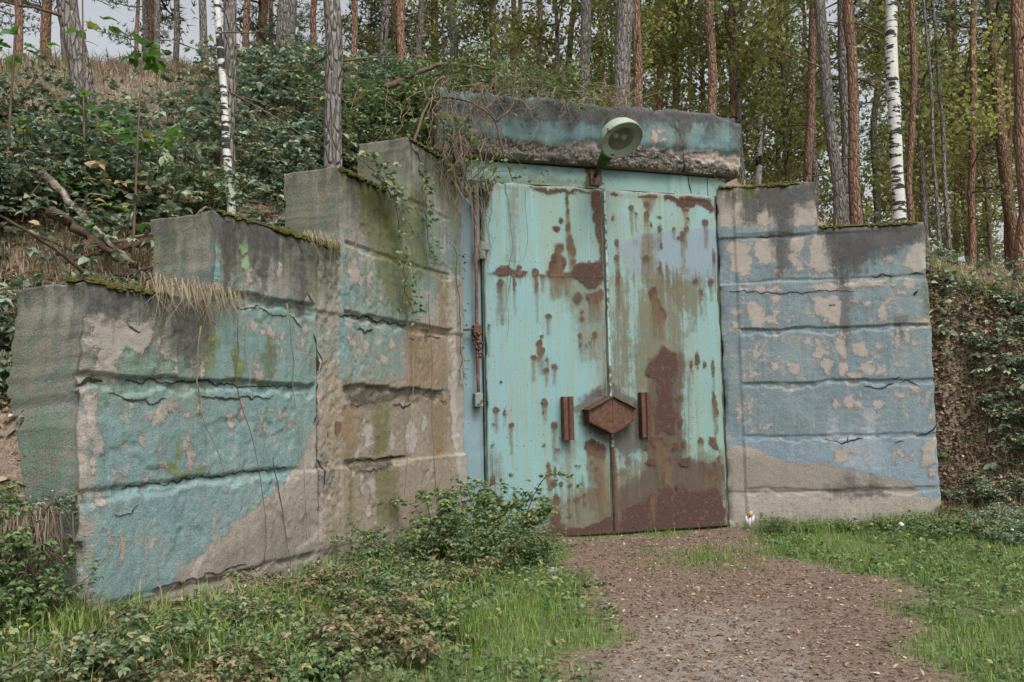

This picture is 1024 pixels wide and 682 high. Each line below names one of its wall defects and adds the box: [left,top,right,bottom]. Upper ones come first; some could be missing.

spalling [444,111,738,176]
peeling [79,289,212,514]
crack [70,289,405,517]
peeling [343,348,468,518]
rust [489,168,727,537]
peeling [725,199,937,478]
crack [825,437,863,445]
damp [820,222,925,345]
crack [863,376,919,389]